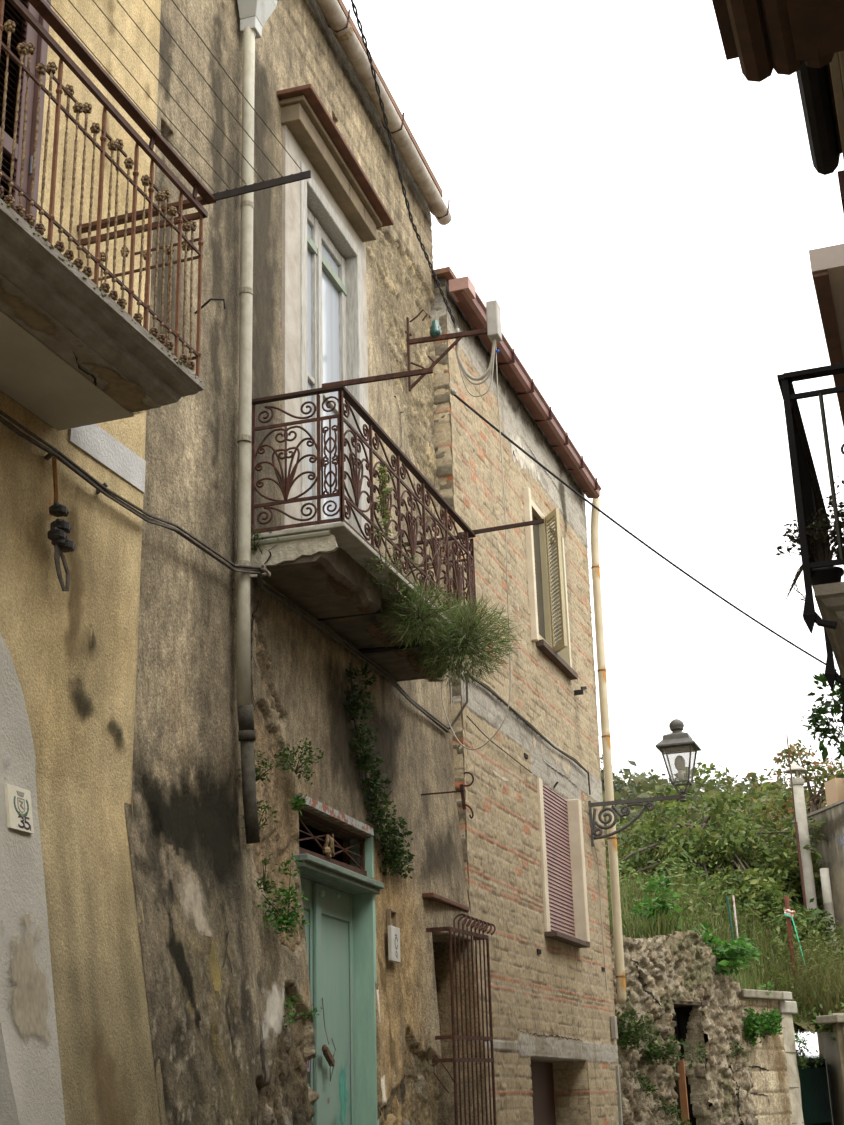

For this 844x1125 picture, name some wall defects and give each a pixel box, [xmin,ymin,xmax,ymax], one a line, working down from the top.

water stain [66,508,96,652]
water stain [74,680,93,717]
water stain [109,720,124,746]
peeling [11,914,50,1043]
spalling [256,988,315,1125]